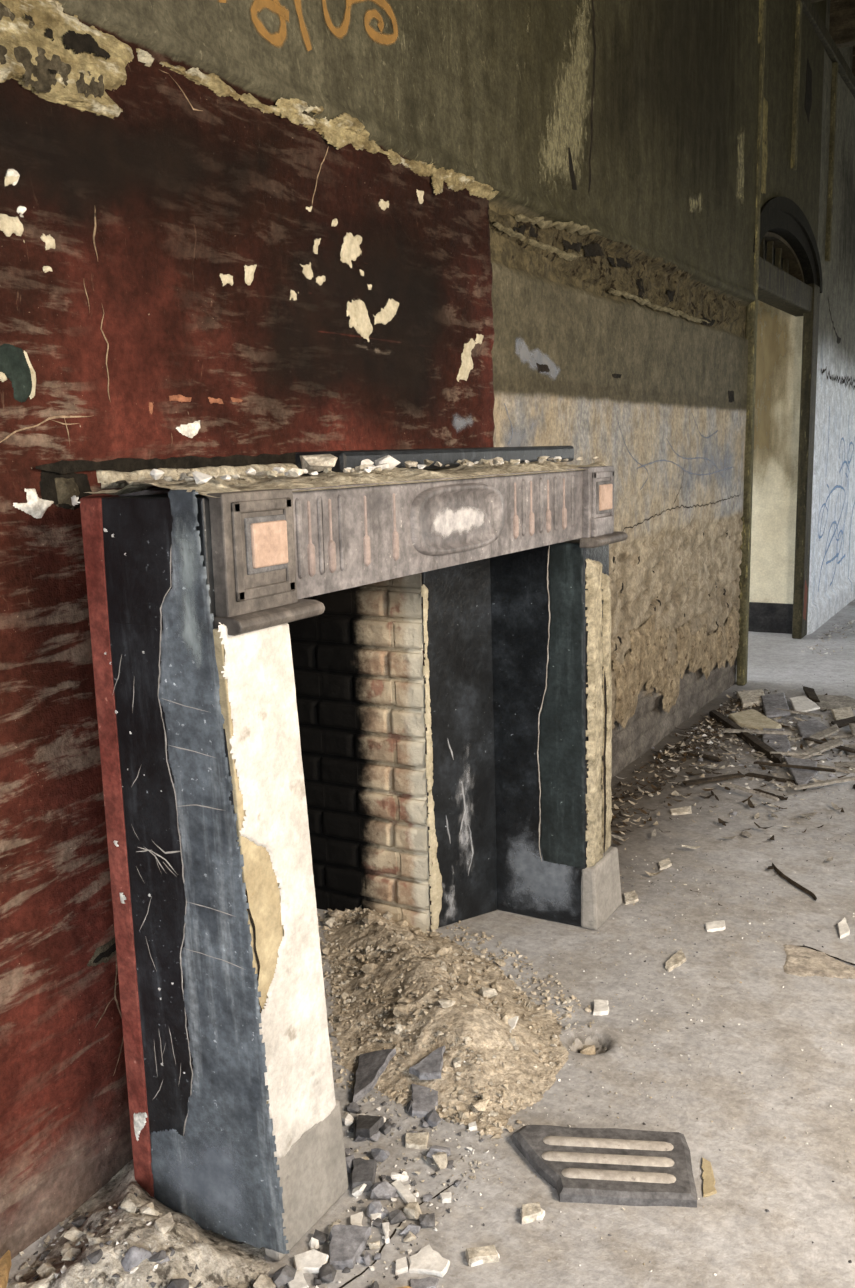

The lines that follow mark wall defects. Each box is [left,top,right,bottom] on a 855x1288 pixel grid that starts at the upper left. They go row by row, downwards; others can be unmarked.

spalling [0,0,741,342]
peeling [0,343,36,403]
peeling [457,334,484,382]
crack [821,366,855,390]
peeling [176,420,200,438]
peeling [134,490,461,1288]